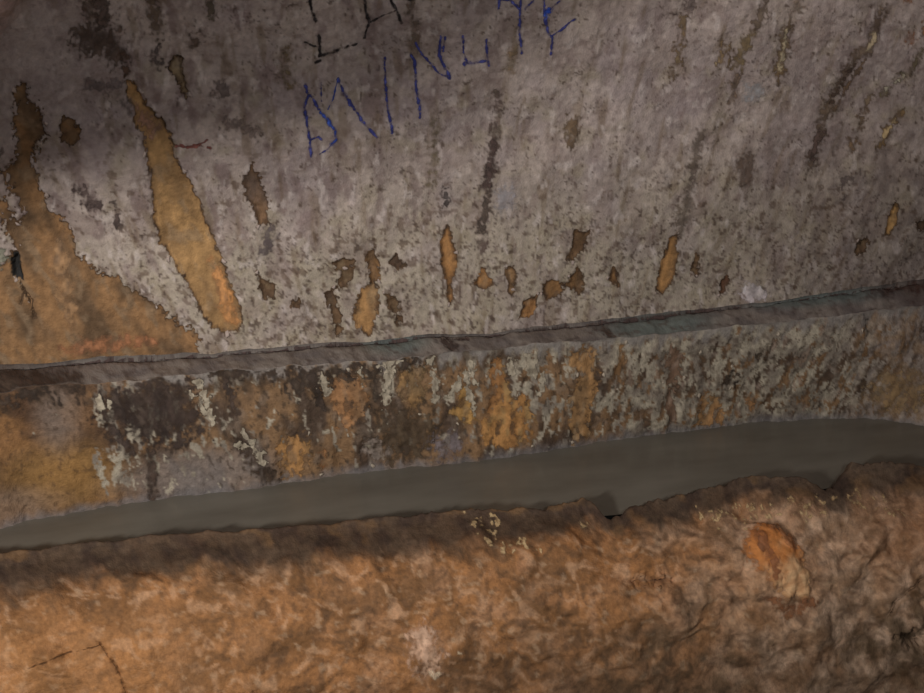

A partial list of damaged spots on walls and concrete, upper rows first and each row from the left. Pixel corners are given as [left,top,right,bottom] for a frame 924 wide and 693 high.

leakage [806,5,888,169]
leakage [848,47,923,154]
flaking render [0,82,202,364]
flaking render [124,76,243,338]
flaking render [324,249,408,337]
flaking render [440,225,459,307]
flaking render [519,229,590,318]
flaking render [655,233,679,294]
leakage [0,369,85,413]
leakage [91,356,462,501]
leakage [468,359,479,387]
crack [31,642,126,693]